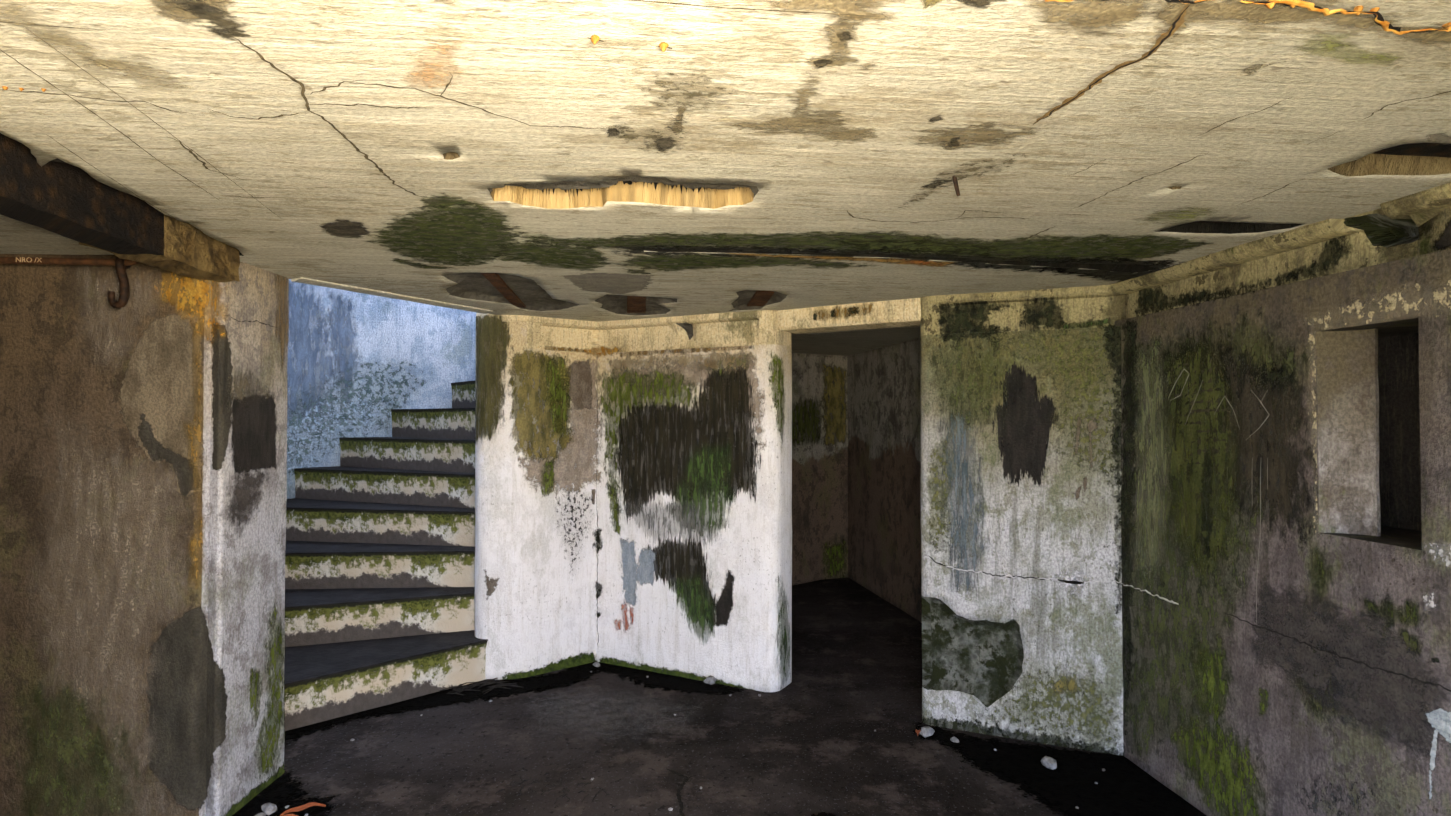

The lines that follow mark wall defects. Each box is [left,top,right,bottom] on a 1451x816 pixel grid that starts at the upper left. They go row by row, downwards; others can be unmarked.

crack [632,0,880,17]
crack [1033,0,1451,125]
crack [0,21,606,219]
crack [1239,91,1451,205]
spalling [1328,142,1451,176]
spalling [487,176,759,209]
spalling [1155,221,1303,234]
water stain [394,258,452,269]
water stain [613,243,1173,282]
water stain [564,273,654,294]
crack [924,555,1179,605]
spalling [922,596,1024,708]